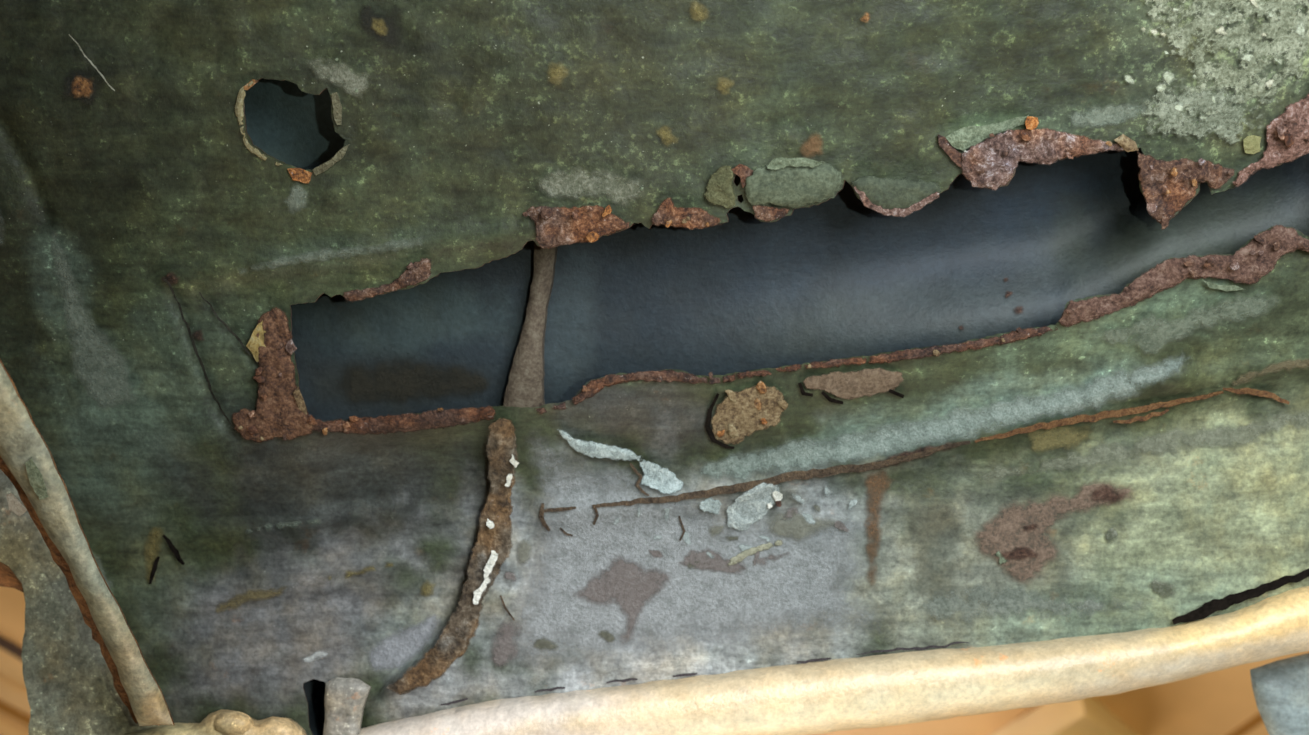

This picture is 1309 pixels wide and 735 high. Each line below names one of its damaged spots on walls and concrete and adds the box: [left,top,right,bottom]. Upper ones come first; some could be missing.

peeling [1142,0,1309,144]
rust [523,205,630,249]
rust [652,198,721,229]
rust [232,307,496,443]
rust [537,225,1309,414]
peeling [473,295,1309,666]
rust [977,483,1131,581]
crack [1172,569,1309,625]